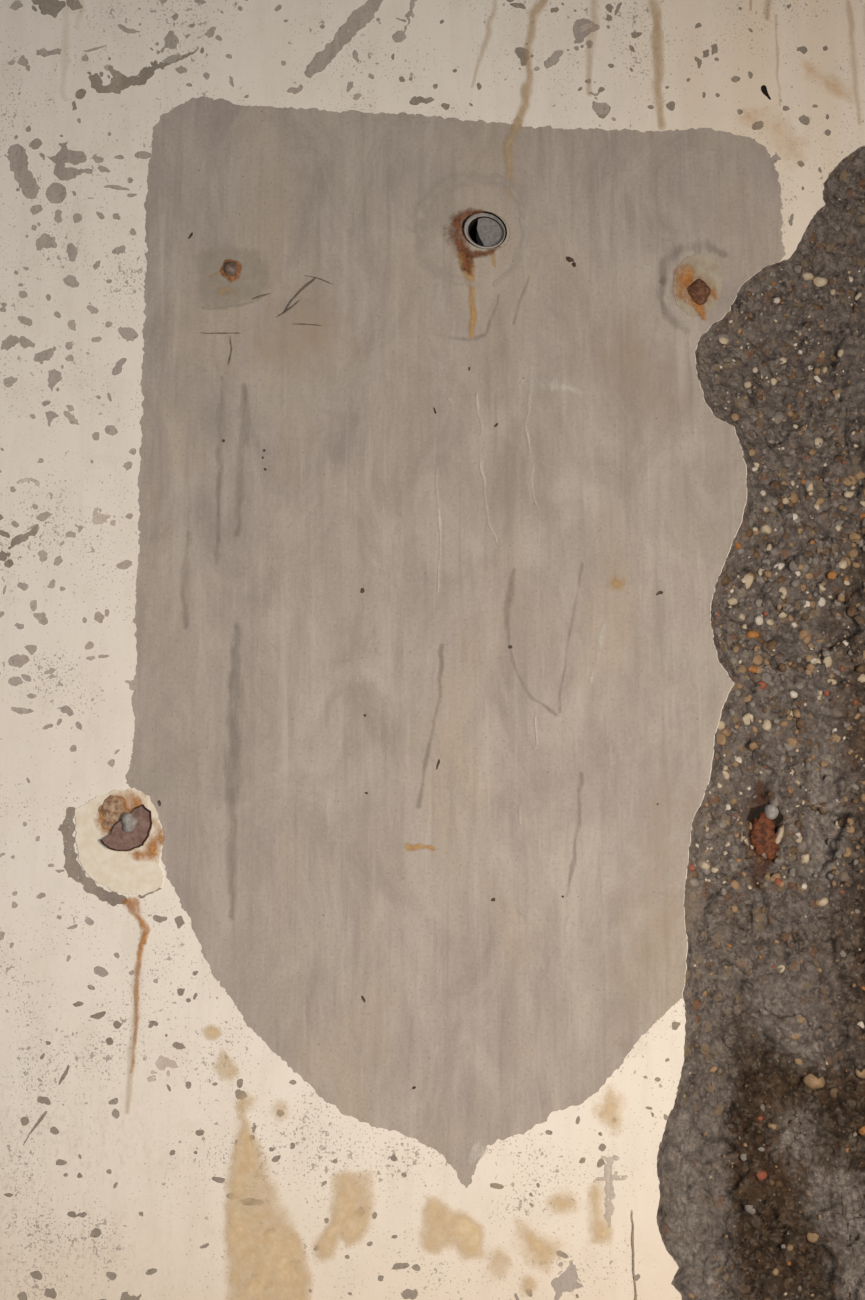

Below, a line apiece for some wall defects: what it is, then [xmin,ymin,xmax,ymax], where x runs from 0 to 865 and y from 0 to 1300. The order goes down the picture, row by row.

peeling [410,84,450,110]
damp [505,0,546,181]
damp [653,14,663,127]
peeling [687,44,719,82]
peeling [731,71,831,136]
corrosion [450,209,496,338]
corrosion [676,266,717,320]
corrosion [98,795,142,832]
corrosion [134,831,164,859]
corrosion [749,786,780,875]
corrosion [124,900,149,1066]